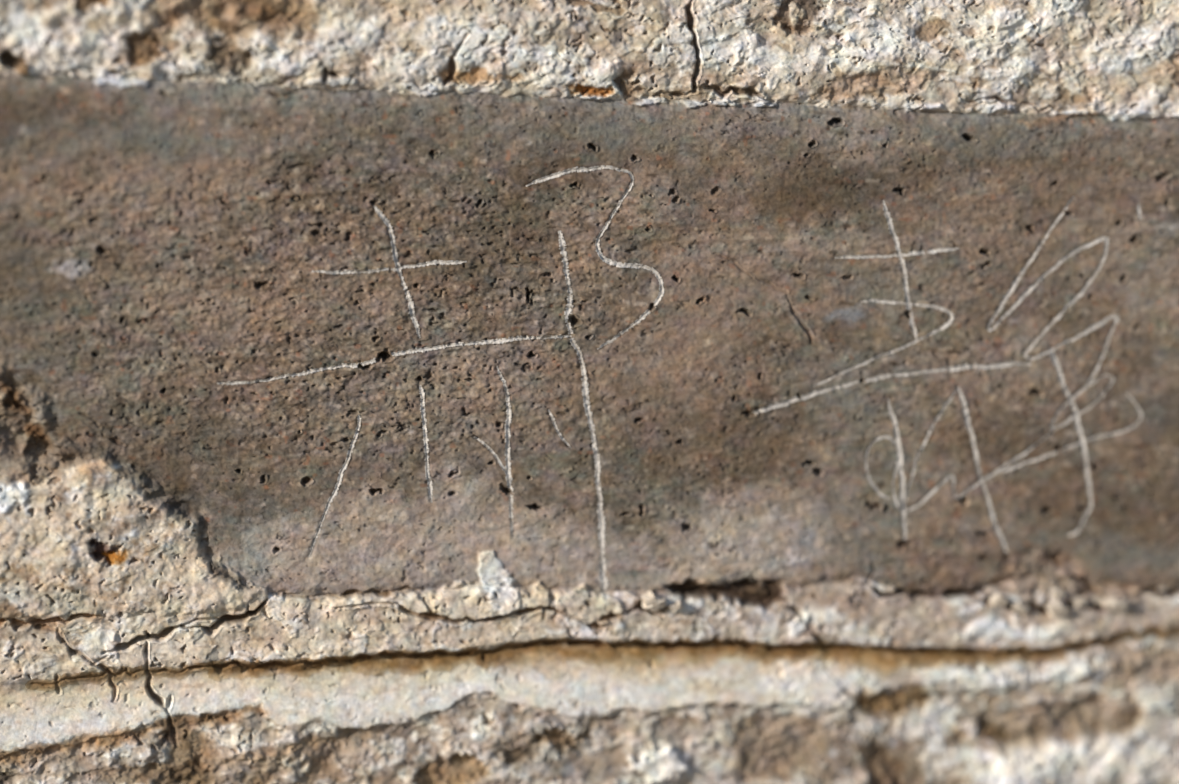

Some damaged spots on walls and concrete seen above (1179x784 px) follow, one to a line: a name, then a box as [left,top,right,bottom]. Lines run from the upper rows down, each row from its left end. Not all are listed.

crack [653,0,778,105]
spalling [0,342,262,593]
crack [0,547,1179,751]
spalling [641,545,878,623]